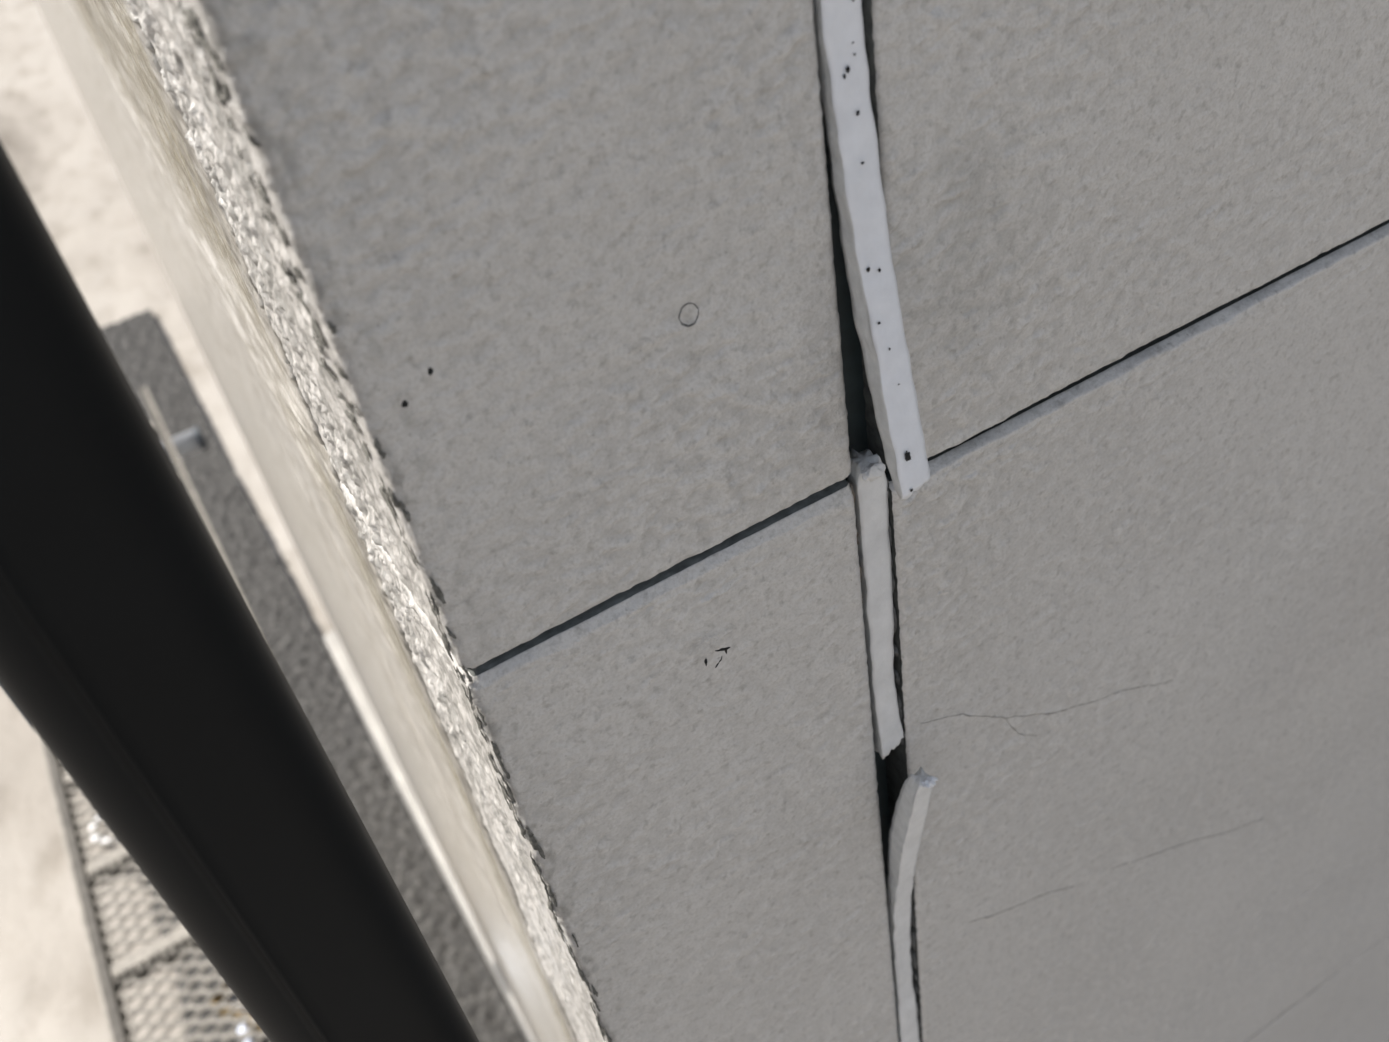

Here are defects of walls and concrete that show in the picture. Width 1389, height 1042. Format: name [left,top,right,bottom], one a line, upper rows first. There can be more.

peeling [813,0,930,759]
peeling [886,767,938,1042]